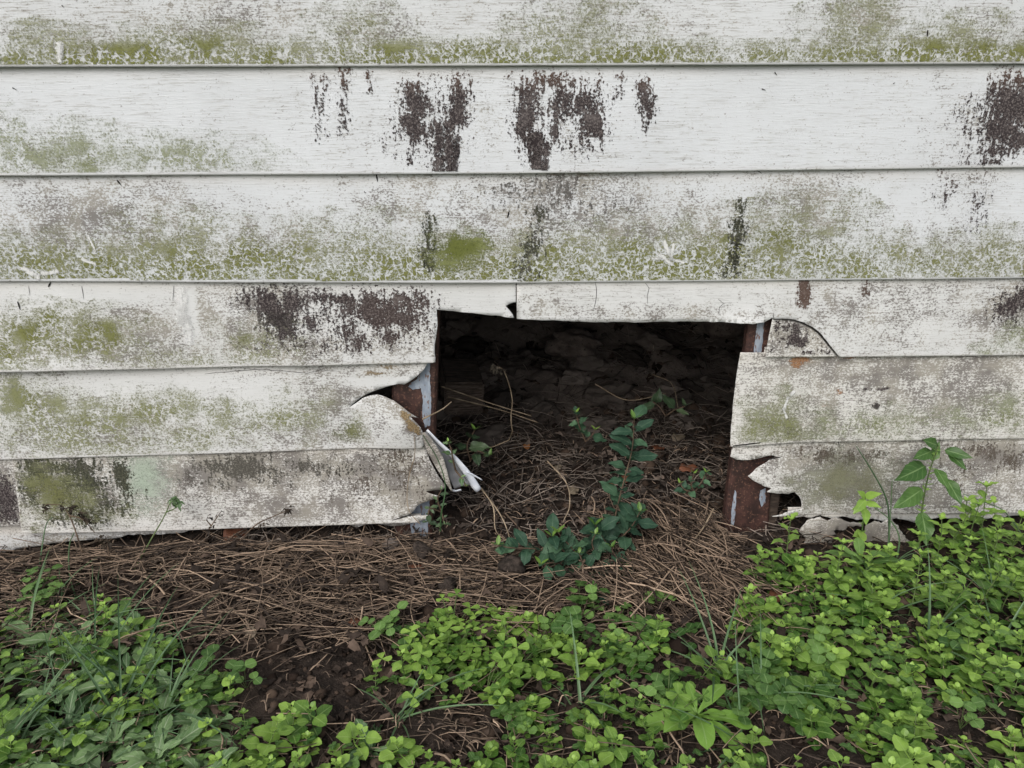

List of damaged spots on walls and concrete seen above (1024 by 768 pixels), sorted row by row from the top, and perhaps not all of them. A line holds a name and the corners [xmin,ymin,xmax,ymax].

water stain [309,67,373,142]
water stain [379,66,477,171]
water stain [502,67,660,177]
water stain [930,64,1024,234]
water stain [513,202,551,281]
water stain [716,198,753,278]
water stain [227,210,453,375]
peeling [754,322,764,352]
crack [773,314,837,354]
peeling [408,363,482,492]
water stain [0,456,156,531]
peeling [410,501,430,536]